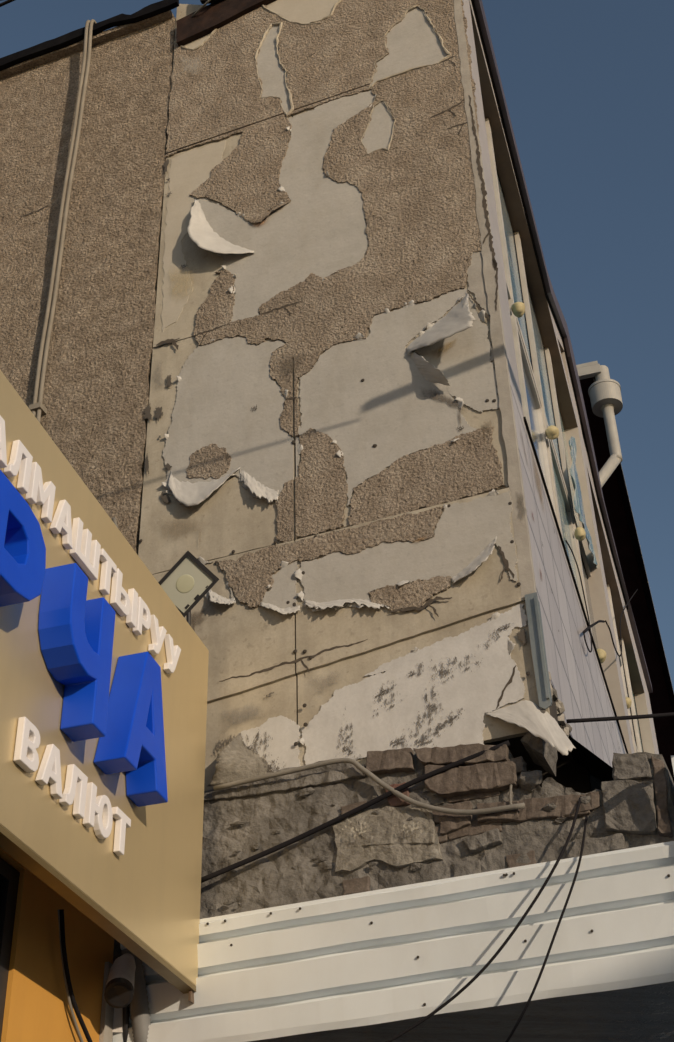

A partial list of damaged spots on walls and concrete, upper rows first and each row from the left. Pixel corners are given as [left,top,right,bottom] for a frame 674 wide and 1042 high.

peeling [161,0,451,332]
peeling [143,251,500,508]
peeling [198,557,236,605]
peeling [259,489,518,615]
crack [219,639,367,682]
peeling [207,604,592,793]
crack [496,666,516,709]